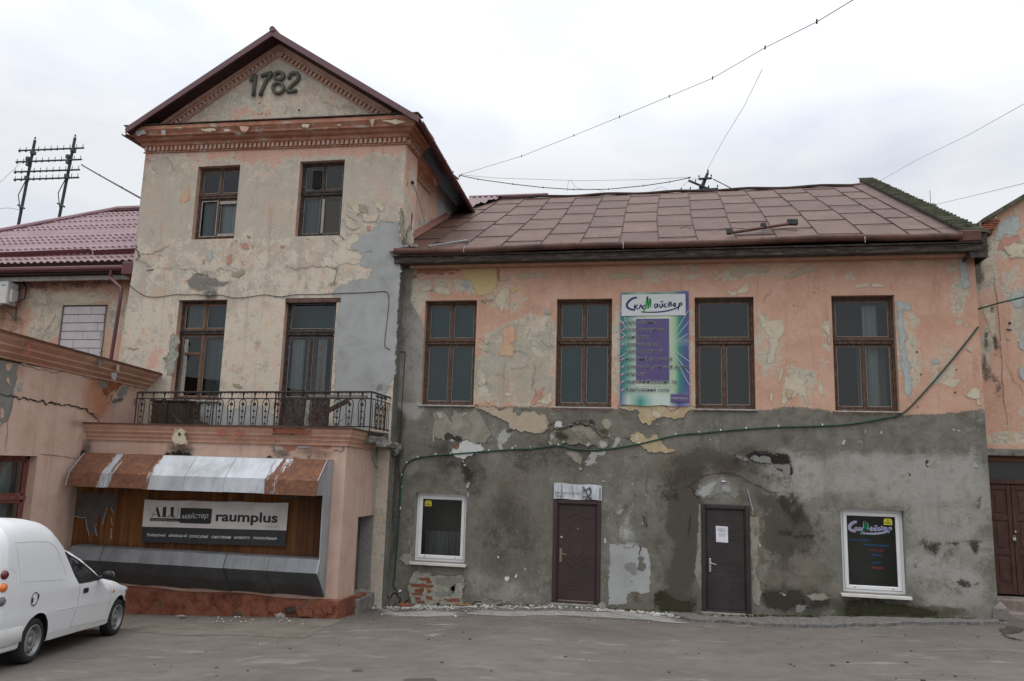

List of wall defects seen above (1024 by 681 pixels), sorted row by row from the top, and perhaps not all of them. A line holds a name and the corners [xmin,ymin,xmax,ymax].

flaking render [994,214,1024,259]
flaking render [163,333,180,375]
peeling [756,309,824,409]
peeling [894,300,922,407]
peeling [981,304,1024,350]
peeling [0,360,23,426]
crack [1,394,99,442]
flaking render [432,392,553,466]
flaking render [566,404,695,476]
water stain [778,495,814,554]
flaking render [398,536,528,607]
water stain [763,590,831,613]